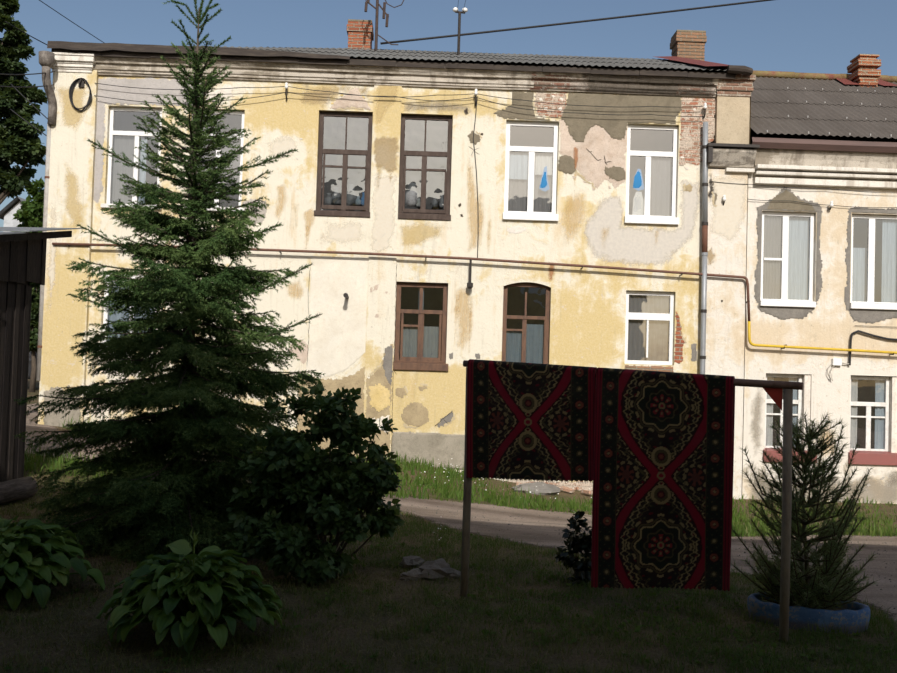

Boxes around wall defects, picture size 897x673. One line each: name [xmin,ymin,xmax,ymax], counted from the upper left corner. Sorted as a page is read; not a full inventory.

leakage [375,138,398,179]
peeling [530,71,627,190]
flaking render [676,83,716,170]
flaking render [625,312,687,372]
peeling [296,344,456,436]
peeling [352,431,391,458]